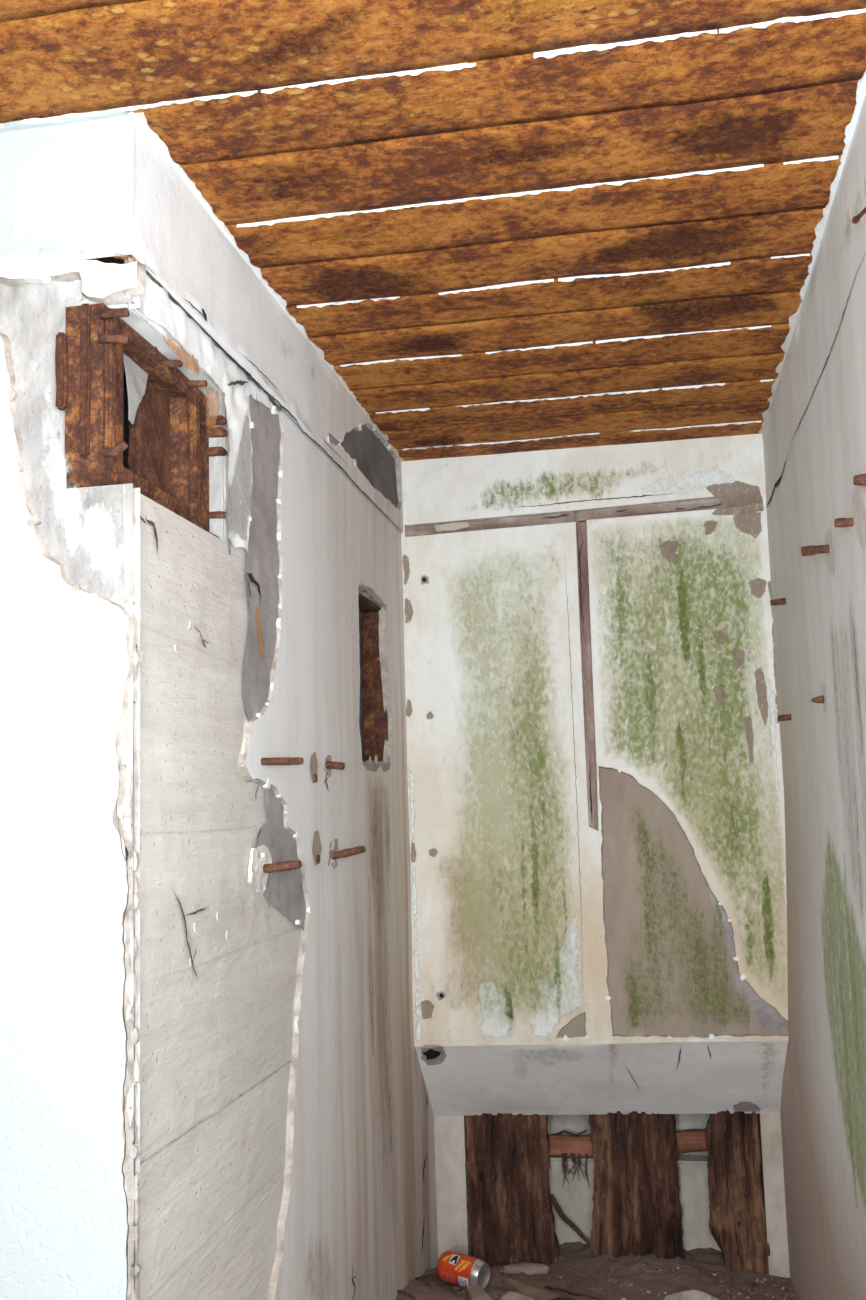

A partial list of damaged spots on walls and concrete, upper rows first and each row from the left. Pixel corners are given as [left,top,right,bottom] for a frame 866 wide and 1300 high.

corrosion [163,336,199,373]
corrosion [206,389,220,428]
flaking render [327,424,398,507]
peeling [704,481,767,538]
crack [766,255,865,508]
damp [678,570,706,705]
flaking render [0,278,312,1300]
damp [769,682,780,812]
damp [470,978,512,1039]
damp [531,900,582,1037]
flaking render [599,767,788,1040]
damp [745,861,787,977]